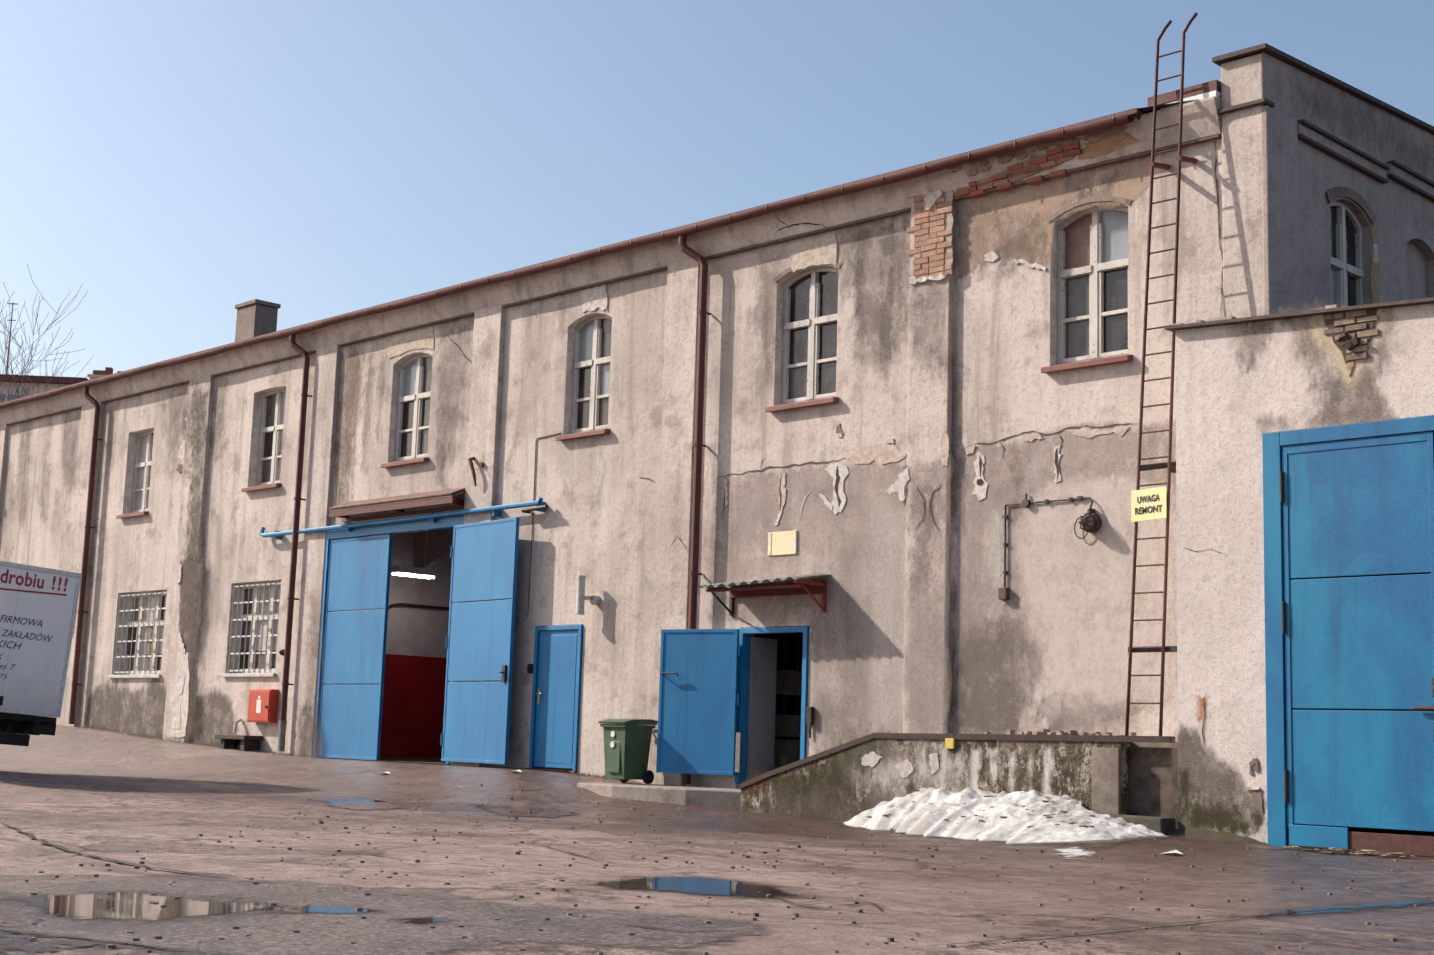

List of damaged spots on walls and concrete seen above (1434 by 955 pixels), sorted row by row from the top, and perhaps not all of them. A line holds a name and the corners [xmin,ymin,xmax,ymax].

flaking render [906,132,1155,285]
crack [1214,140,1223,312]
flaking render [1308,224,1388,389]
damp [186,392,208,592]
flaking render [819,438,910,514]
flaking render [940,431,989,501]
crack [962,423,1139,459]
flaking render [1022,425,1129,483]
damp [85,679,166,739]
damp [183,644,236,746]
damp [772,748,1054,821]
damp [1172,728,1264,830]